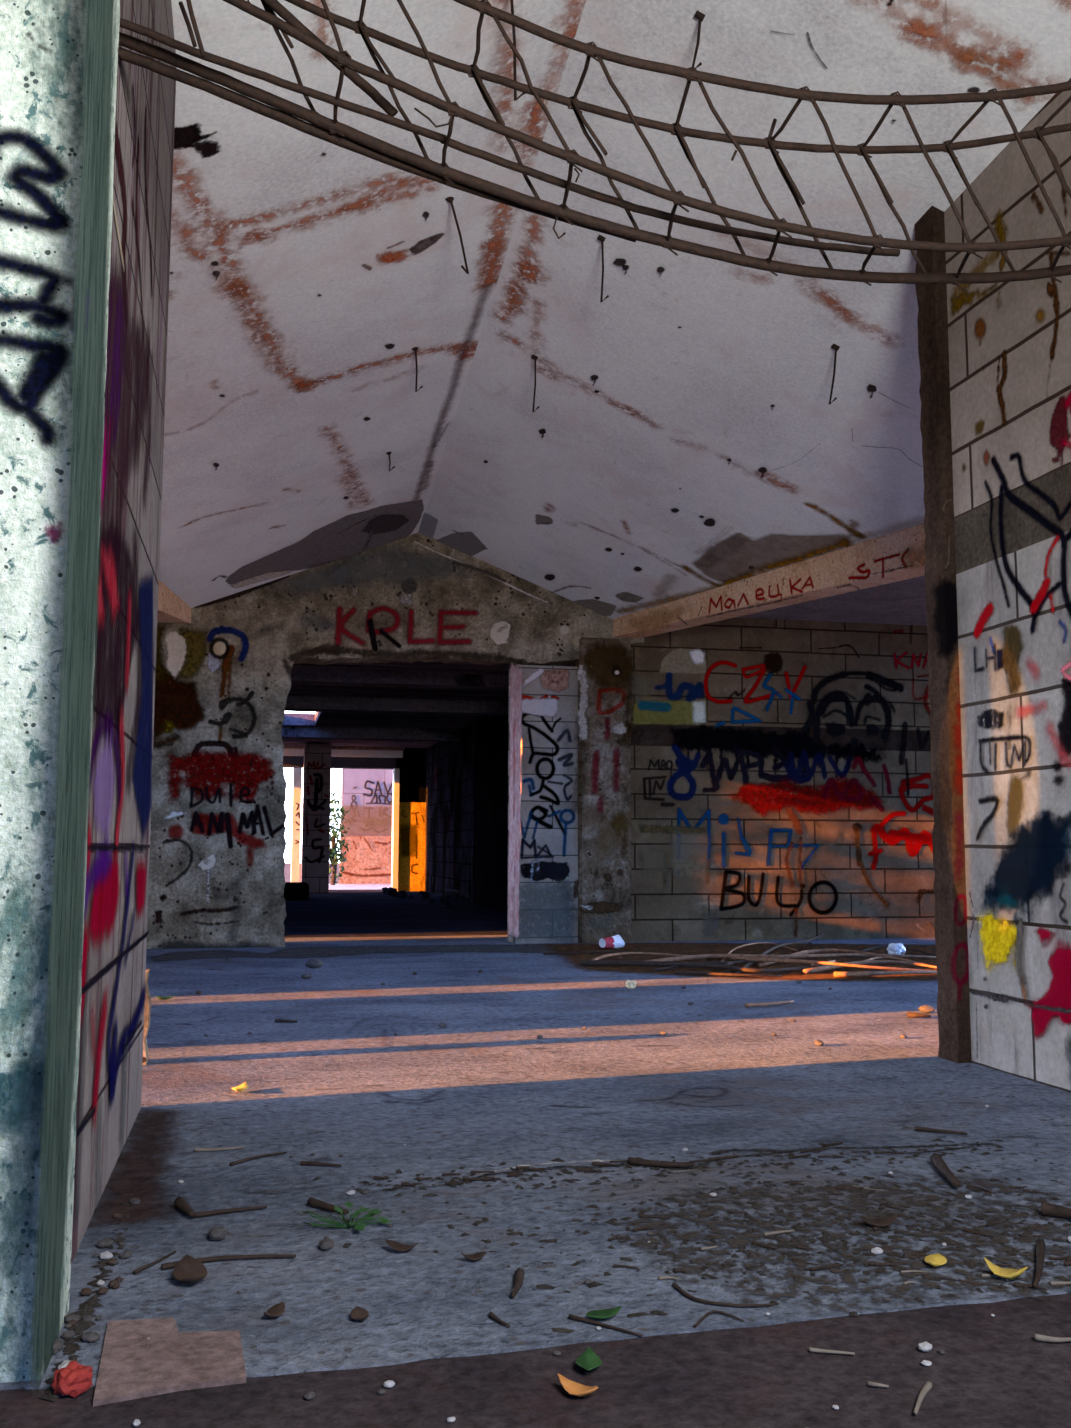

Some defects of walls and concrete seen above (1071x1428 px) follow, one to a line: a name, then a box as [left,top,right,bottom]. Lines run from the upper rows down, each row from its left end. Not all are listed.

corrosion [907,20,1031,98]
corrosion [524,87,549,157]
corrosion [173,158,478,392]
corrosion [479,203,541,345]
spalling [212,499,488,588]